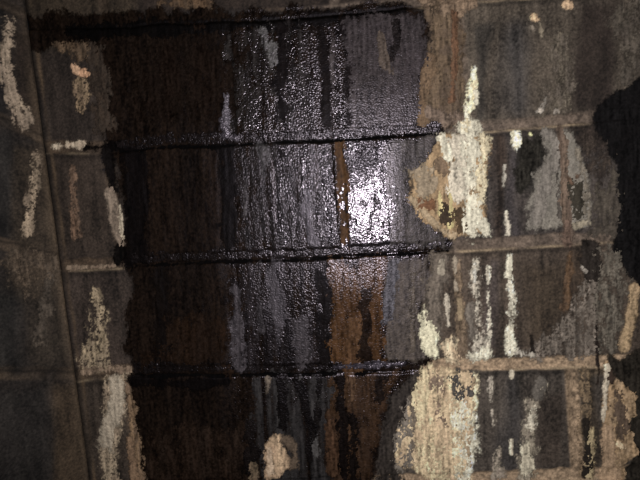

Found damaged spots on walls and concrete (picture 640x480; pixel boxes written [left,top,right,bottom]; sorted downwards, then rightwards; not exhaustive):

water stain [0,0,493,480]
corrosion [334,140,351,250]
water stain [502,0,640,480]